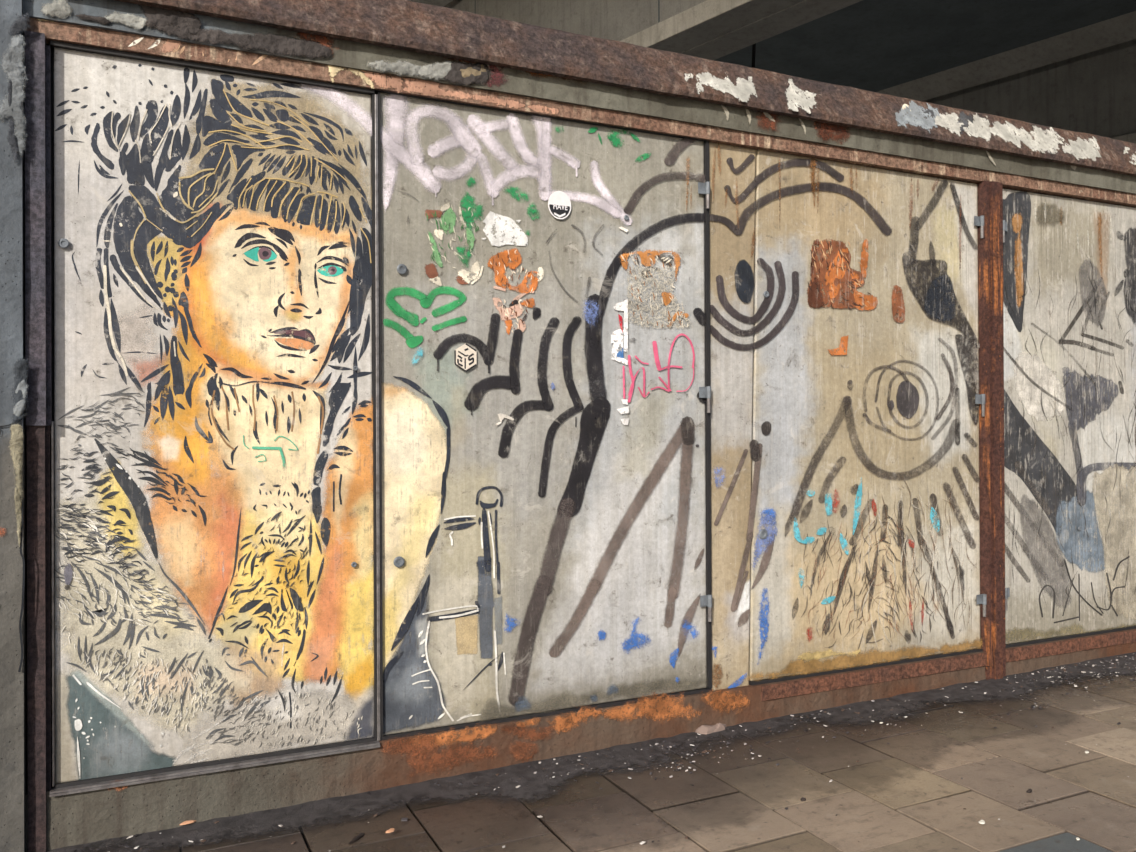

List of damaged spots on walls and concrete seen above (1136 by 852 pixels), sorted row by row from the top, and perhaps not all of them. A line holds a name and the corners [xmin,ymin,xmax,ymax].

corrosion [297,32,333,48]
spalling [0,0,559,162]
peeling [685,72,757,102]
peeling [786,79,816,114]
corrosion [799,118,849,144]
peeling [895,100,1102,161]
leakage [1006,625,1084,642]
leakage [750,640,982,679]
corrosion [704,665,748,712]
corrosion [383,693,696,771]